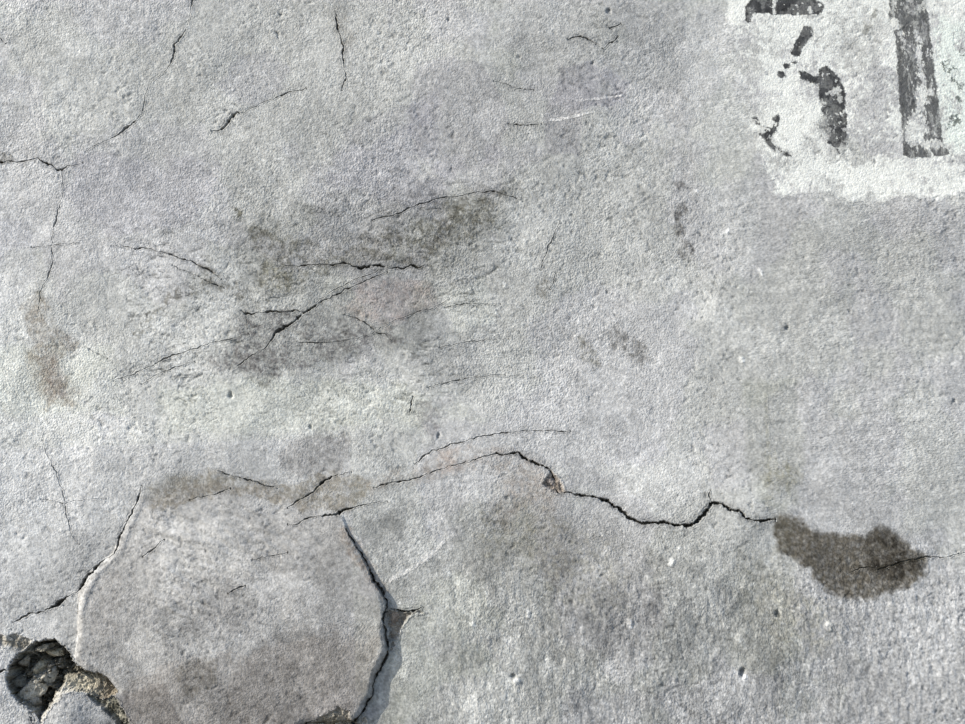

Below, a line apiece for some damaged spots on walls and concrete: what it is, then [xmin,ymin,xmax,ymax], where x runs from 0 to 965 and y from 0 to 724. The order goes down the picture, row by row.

crack [333,11,348,90]
crack [0,0,197,317]
crack [212,87,307,133]
crack [372,188,523,222]
crack [112,244,224,289]
crack [89,260,508,385]
crack [41,440,106,544]
crack [13,486,143,624]
crack [190,429,775,724]
leakage [731,392,929,669]
crack [847,551,965,575]
crack [28,712,40,724]